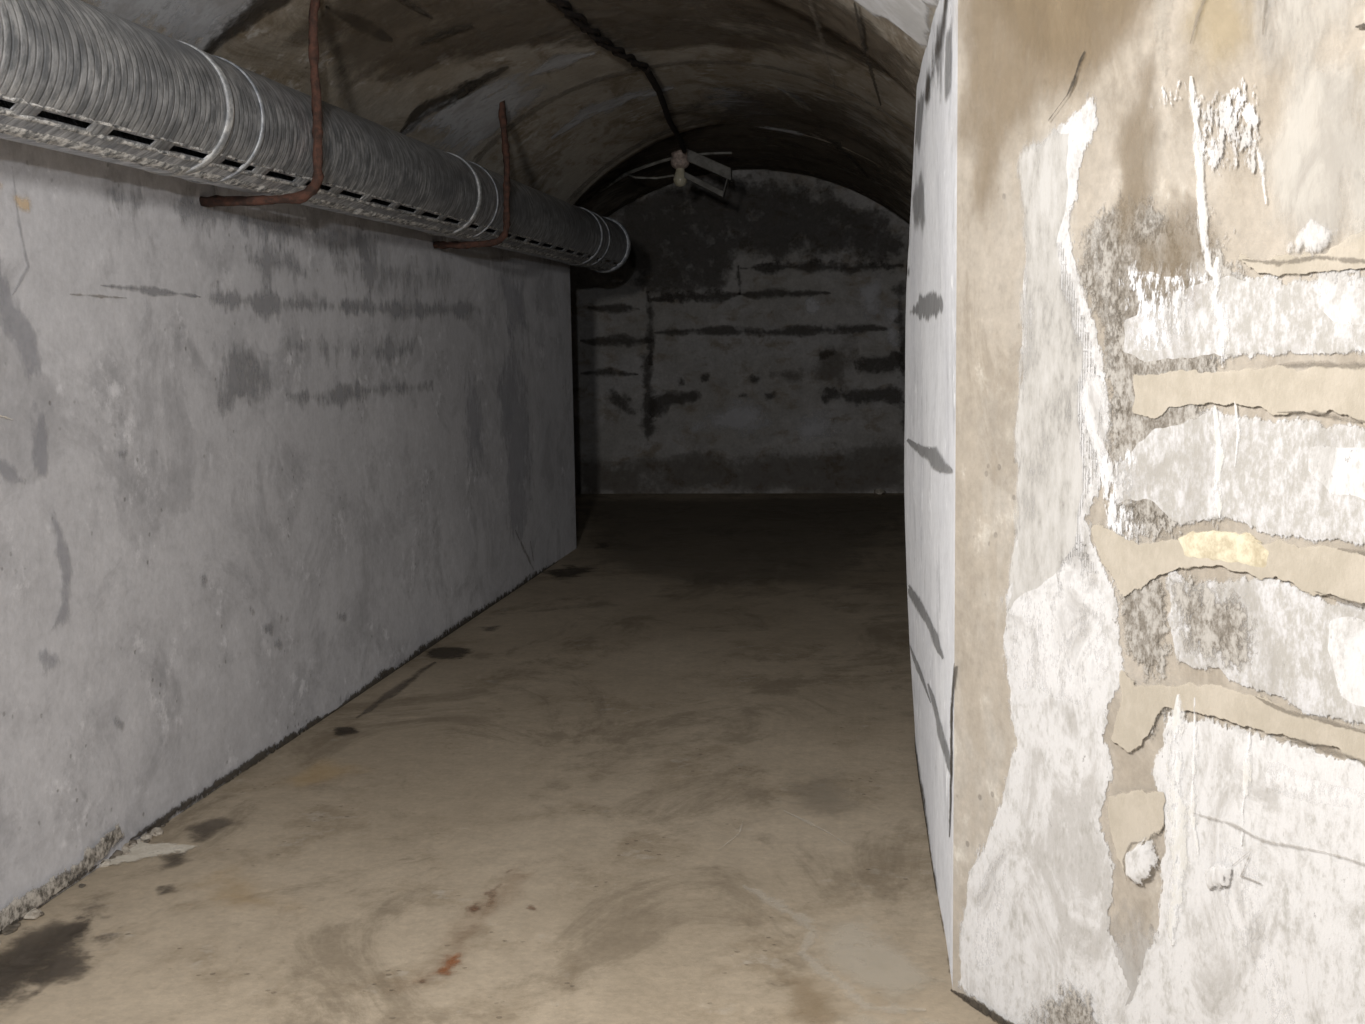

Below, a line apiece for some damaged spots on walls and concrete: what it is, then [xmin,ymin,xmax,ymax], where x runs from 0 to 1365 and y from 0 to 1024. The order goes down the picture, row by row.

damp [0,0,951,364]
peeling [958,71,1365,1024]
damp [0,923,86,1000]
spalling [0,824,166,945]